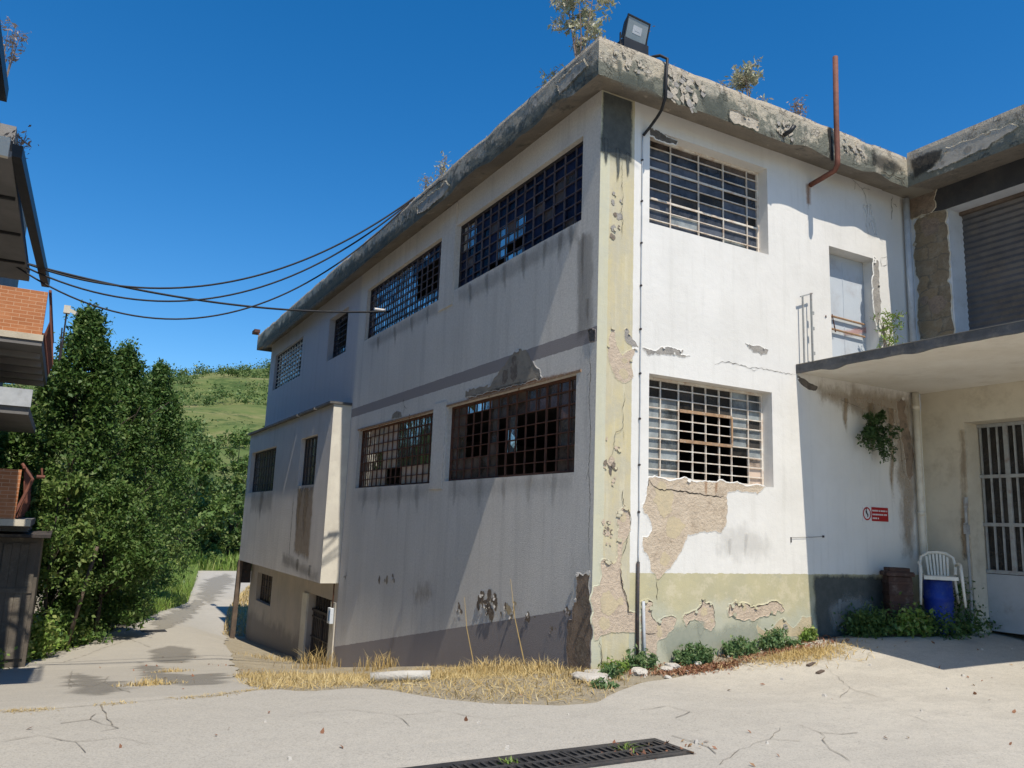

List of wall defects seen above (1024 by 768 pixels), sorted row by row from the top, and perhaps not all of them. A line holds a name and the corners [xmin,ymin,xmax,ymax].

spalling [667,66,706,113]
leakage [601,92,632,178]
spalling [909,189,956,340]
peeling [465,348,542,398]
peeling [588,327,690,384]
peeling [745,343,769,356]
leakage [824,391,914,545]
leakage [295,488,313,557]
peeling [476,589,536,623]
peeling [549,475,814,671]